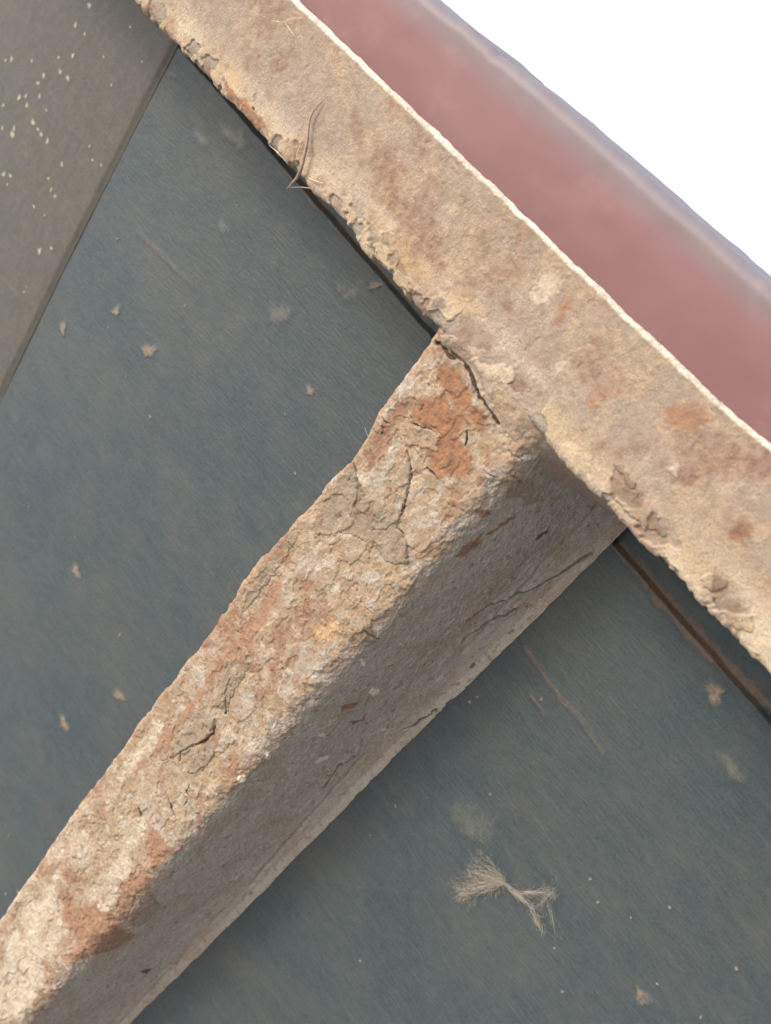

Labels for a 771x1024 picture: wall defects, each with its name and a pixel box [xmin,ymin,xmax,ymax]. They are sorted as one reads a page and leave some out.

peeling [181,45,225,97]
peeling [268,130,299,169]
peeling [366,233,417,295]
corrosion [358,348,494,487]
crack [433,339,524,478]
peeling [709,397,727,417]
crack [380,415,438,551]
peeling [608,461,668,537]
crack [458,549,595,646]
peeling [700,568,755,633]
crack [166,710,227,817]
corrosion [19,822,184,1024]